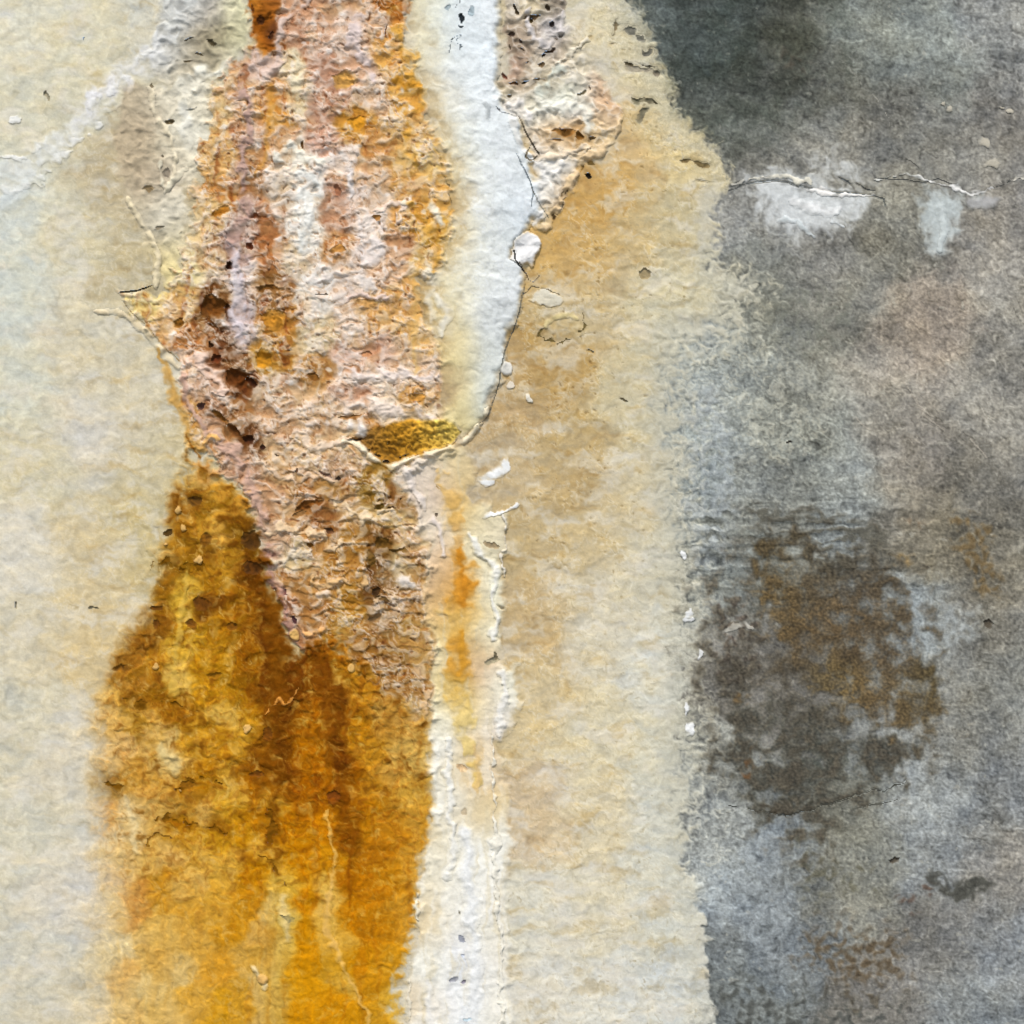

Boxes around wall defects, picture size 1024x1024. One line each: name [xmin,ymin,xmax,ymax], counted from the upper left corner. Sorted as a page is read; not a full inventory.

corrosion [65,347,485,1024]
spalling [111,0,457,712]
damp [589,0,1024,377]
damp [658,362,1000,1024]
crack [880,157,947,207]